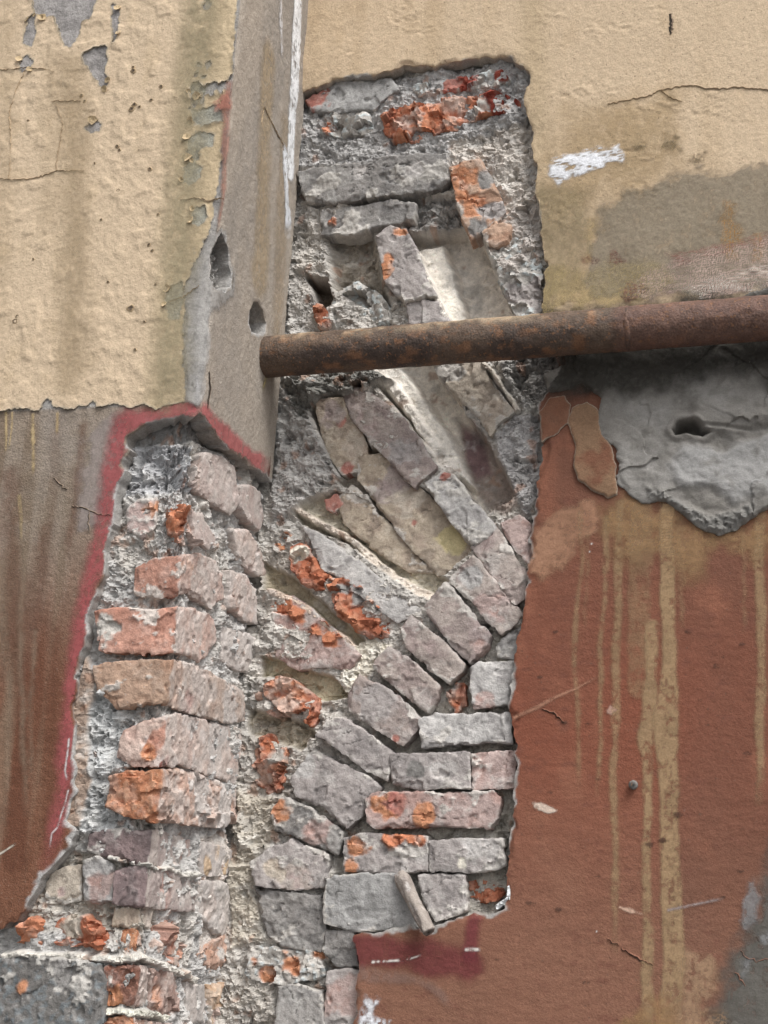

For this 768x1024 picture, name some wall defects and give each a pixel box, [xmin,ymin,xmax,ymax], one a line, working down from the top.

crack [0,67,78,180]
peeling [15,0,96,72]
peeling [85,116,101,133]
peeling [82,4,121,92]
crack [608,85,768,104]
peeling [154,77,235,406]
flaking render [285,60,547,334]
water stain [536,163,768,297]
flaking render [0,356,618,1024]
water stain [604,499,768,1024]